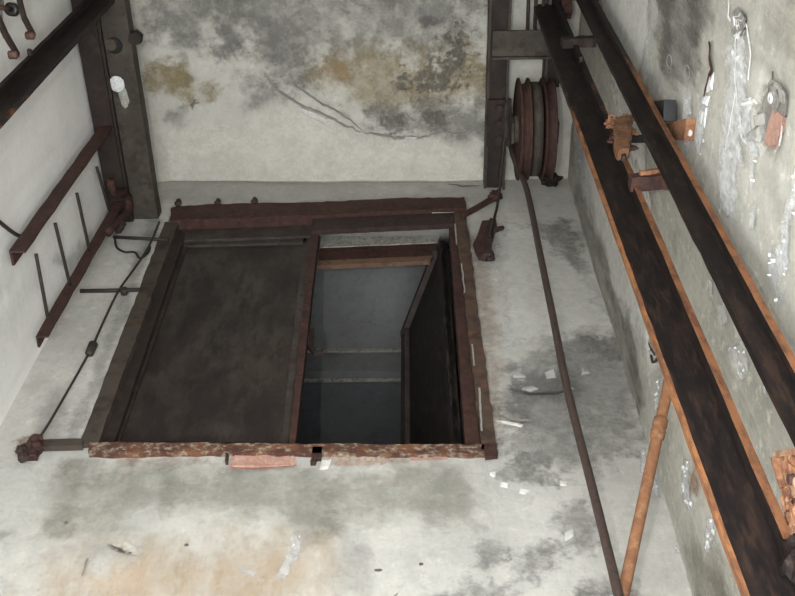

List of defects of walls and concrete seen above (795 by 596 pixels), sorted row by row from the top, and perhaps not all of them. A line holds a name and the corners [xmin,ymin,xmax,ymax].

leakage [222,0,485,141]
crack [264,74,475,140]
leakage [717,38,757,218]
leakage [767,169,795,304]